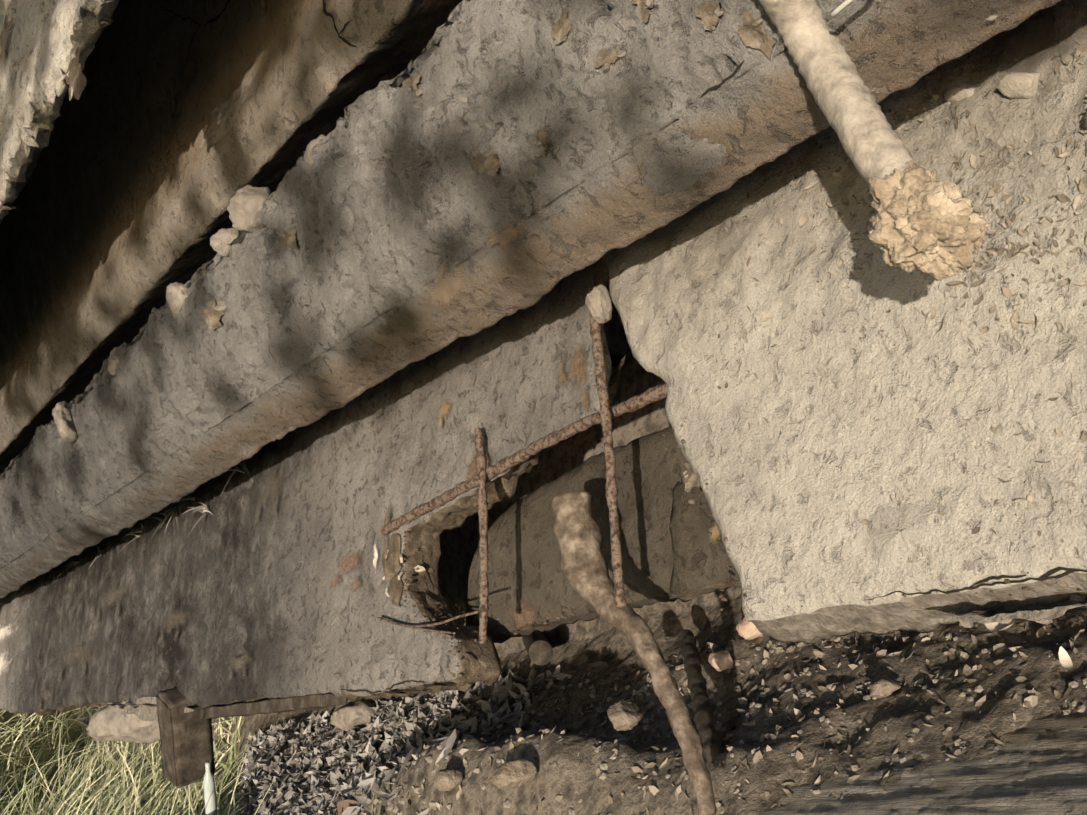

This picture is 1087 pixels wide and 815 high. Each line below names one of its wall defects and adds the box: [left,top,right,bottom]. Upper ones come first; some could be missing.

crack [323,0,357,47]
spalling [682,463,701,492]
spalling [381,534,426,607]
corrosion [513,604,548,627]